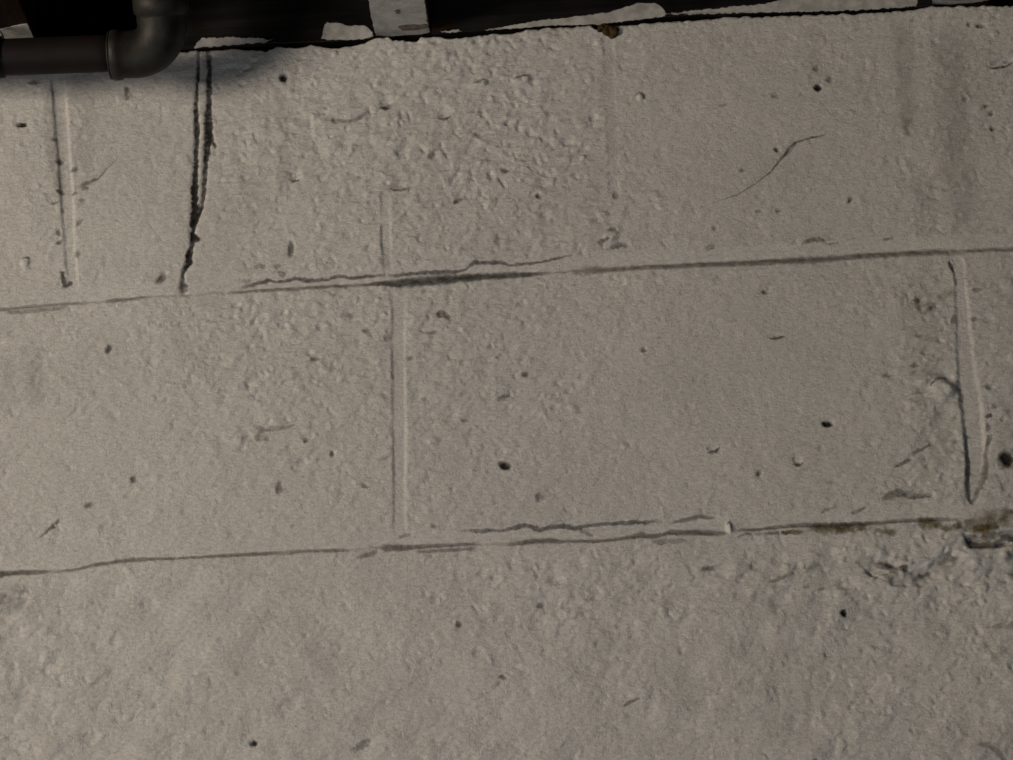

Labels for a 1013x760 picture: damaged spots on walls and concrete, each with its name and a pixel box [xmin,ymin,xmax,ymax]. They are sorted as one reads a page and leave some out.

crack [180,55,216,289]
crack [349,261,531,287]